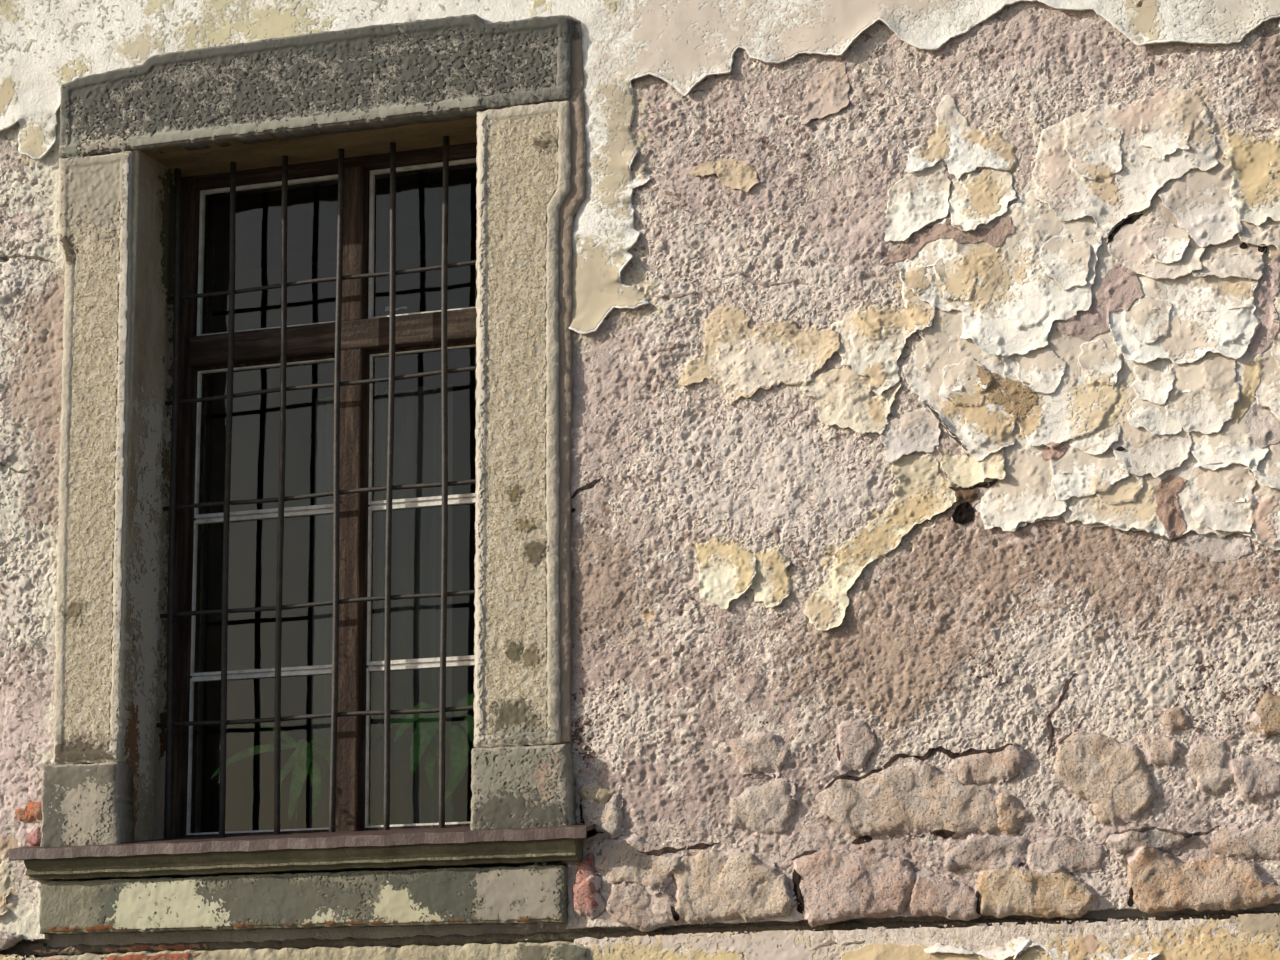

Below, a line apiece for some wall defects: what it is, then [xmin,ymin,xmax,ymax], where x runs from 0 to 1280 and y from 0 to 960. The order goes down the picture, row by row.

spalling [973,1,1094,45]
peeling [572,19,1280,646]
spalling [0,108,65,846]
spalling [1149,589,1279,667]
crack [812,673,1082,801]
spalling [0,854,51,959]
peeling [107,879,231,930]
peeling [302,906,351,924]
peeling [369,878,453,923]